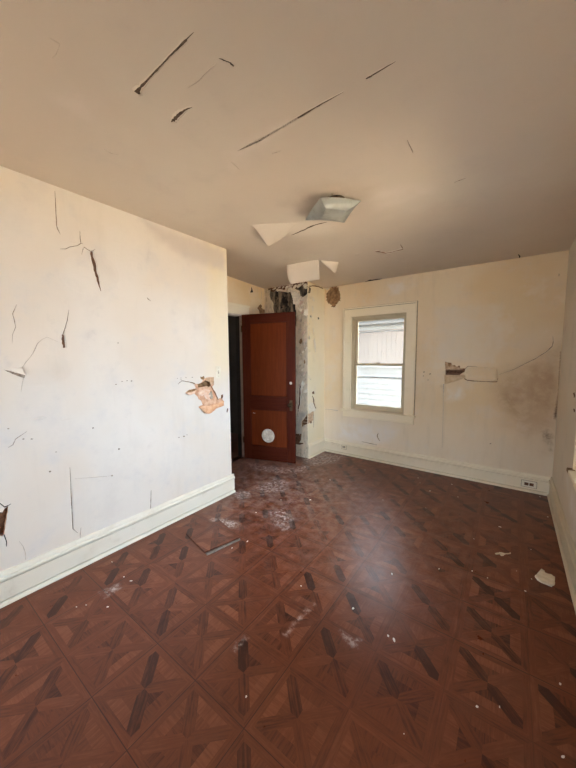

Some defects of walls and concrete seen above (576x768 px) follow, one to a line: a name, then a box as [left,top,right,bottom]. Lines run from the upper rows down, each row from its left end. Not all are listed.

crack [189,58,235,87]
crack [54,191,95,255]
crack [10,304,18,343]
spalling [177,376,228,414]
spalling [257,282,340,445]
spalling [442,362,498,415]